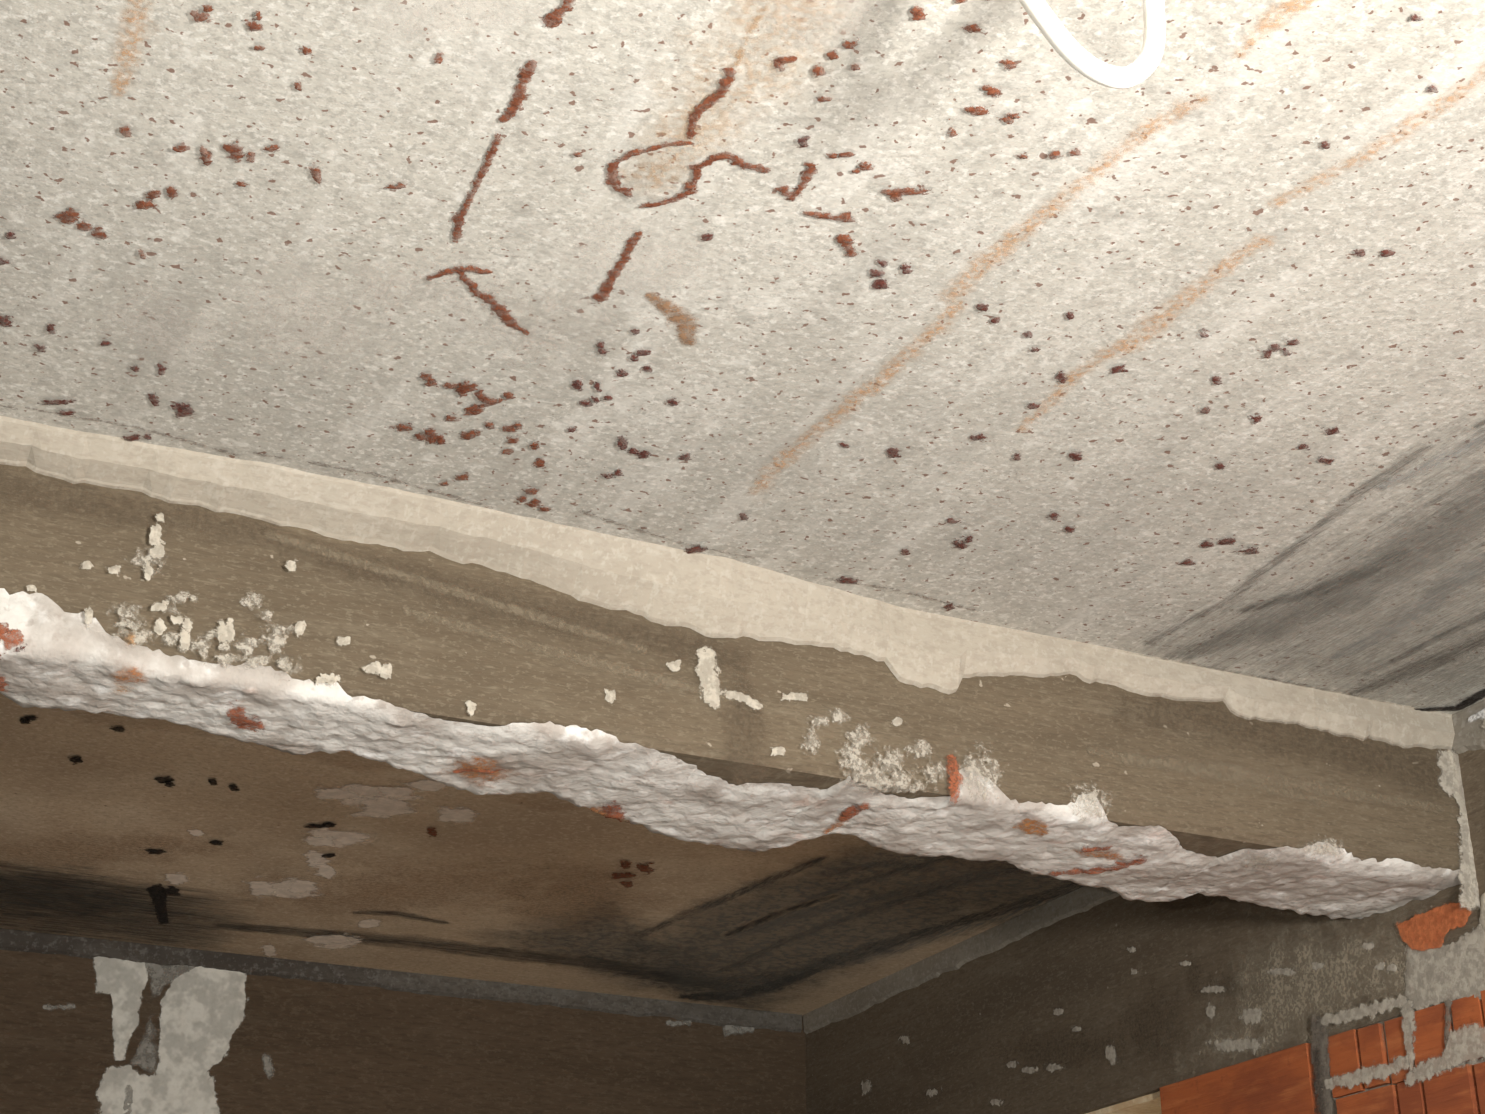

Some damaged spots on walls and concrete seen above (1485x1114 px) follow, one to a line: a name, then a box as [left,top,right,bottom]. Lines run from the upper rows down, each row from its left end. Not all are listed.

rust [948,85,1020,138]
rust [53,208,108,240]
rust [172,140,280,166]
rust [826,152,874,174]
rust [880,185,929,202]
water stain [277,535,646,651]
water stain [1147,489,1485,674]
rust [0,623,27,692]
crack [1415,689,1485,711]
water stain [1089,750,1480,911]
water stain [0,848,1082,1004]
peeling [94,956,247,1114]